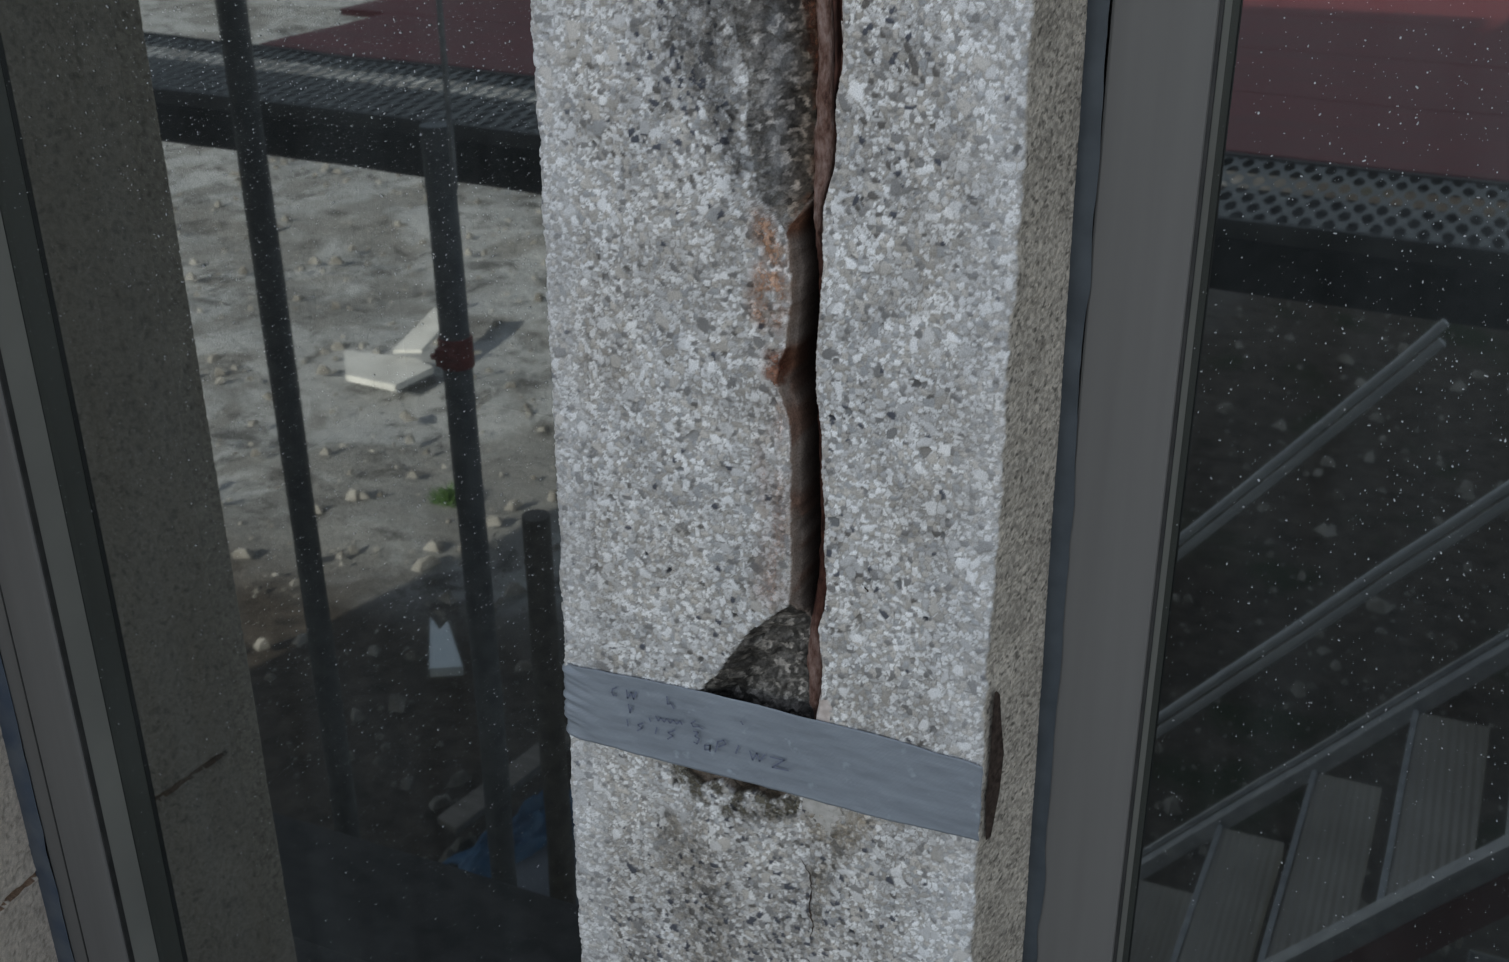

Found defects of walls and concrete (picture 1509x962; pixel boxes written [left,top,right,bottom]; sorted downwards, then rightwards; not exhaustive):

spalling [731,0,819,232]
rust [802,0,843,139]
rust [764,350,788,387]
crack [777,17,844,698]
spalling [699,605,832,723]
crack [0,873,37,911]